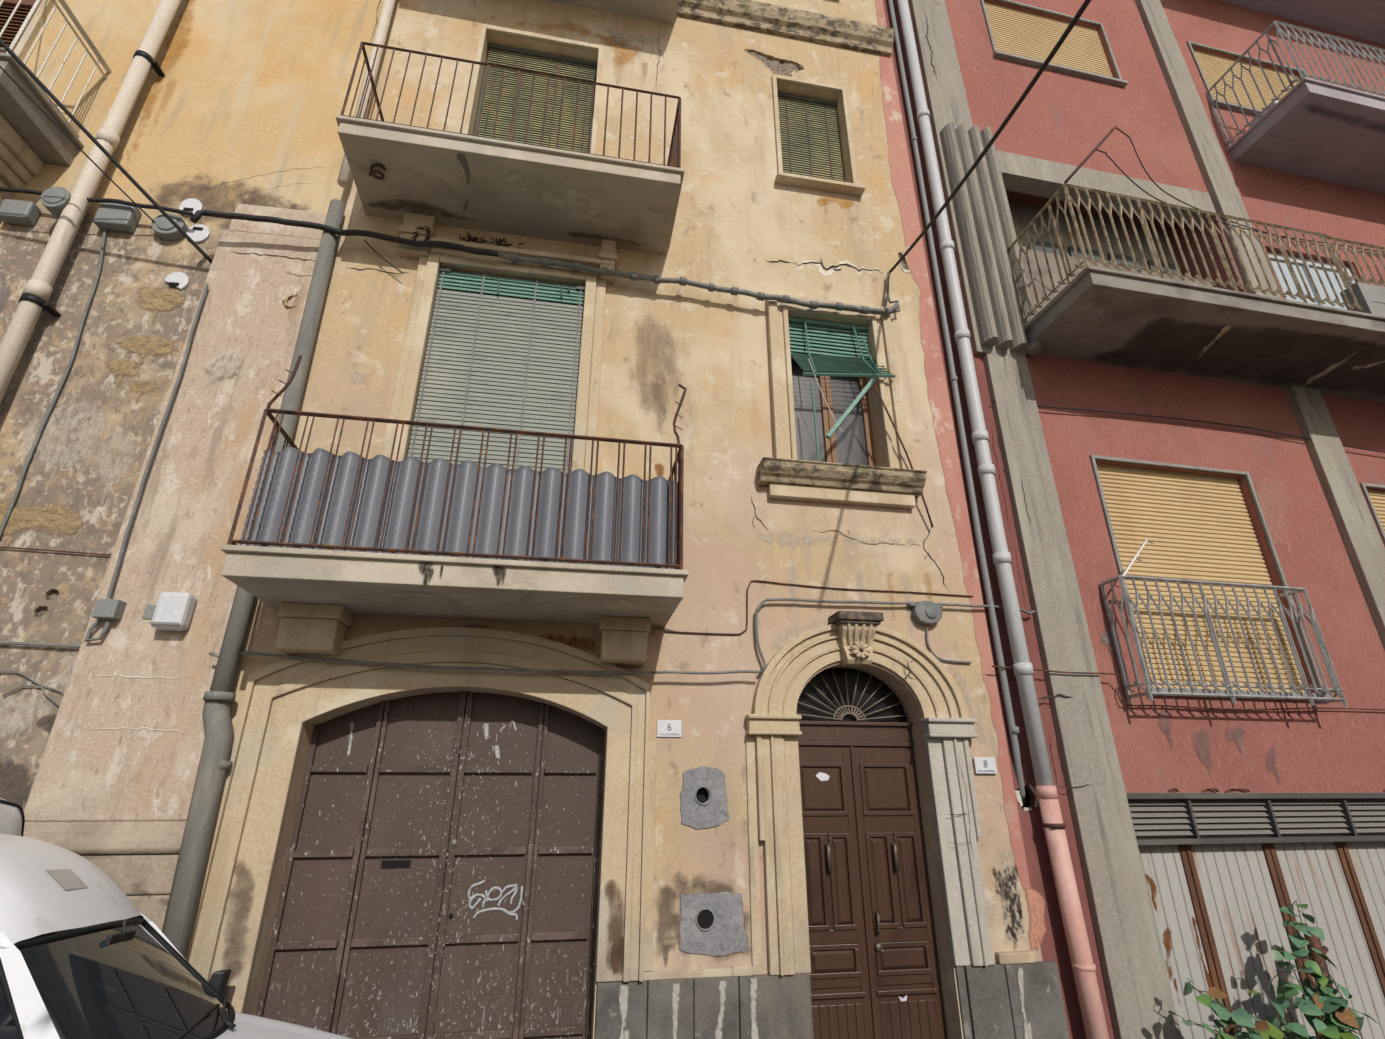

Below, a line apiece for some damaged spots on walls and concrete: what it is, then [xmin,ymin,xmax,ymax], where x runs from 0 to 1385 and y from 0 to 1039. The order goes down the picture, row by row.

spalling [743,49,803,77]
crack [768,259,885,278]
peeling [0,277,10,311]
peeling [107,286,185,403]
peeling [24,401,134,485]
peeling [0,500,83,550]
damp [657,879,732,963]